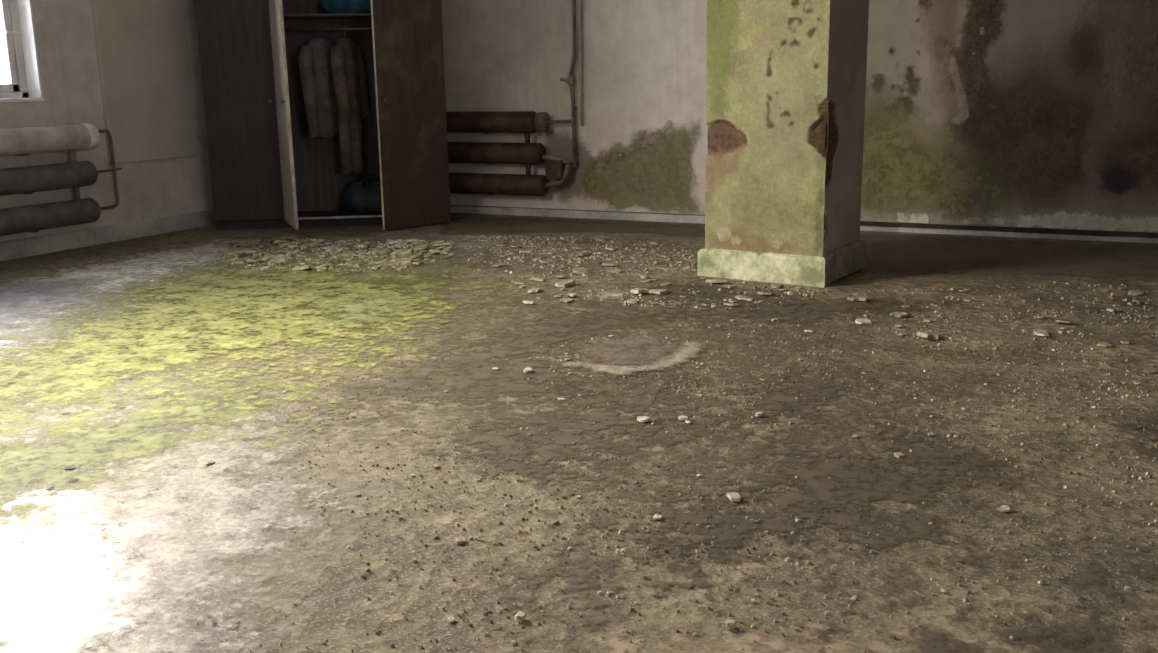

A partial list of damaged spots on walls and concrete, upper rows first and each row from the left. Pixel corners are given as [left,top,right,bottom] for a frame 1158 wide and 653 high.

leakage [766,0,819,76]
spalling [705,119,747,199]
spalling [807,102,839,188]